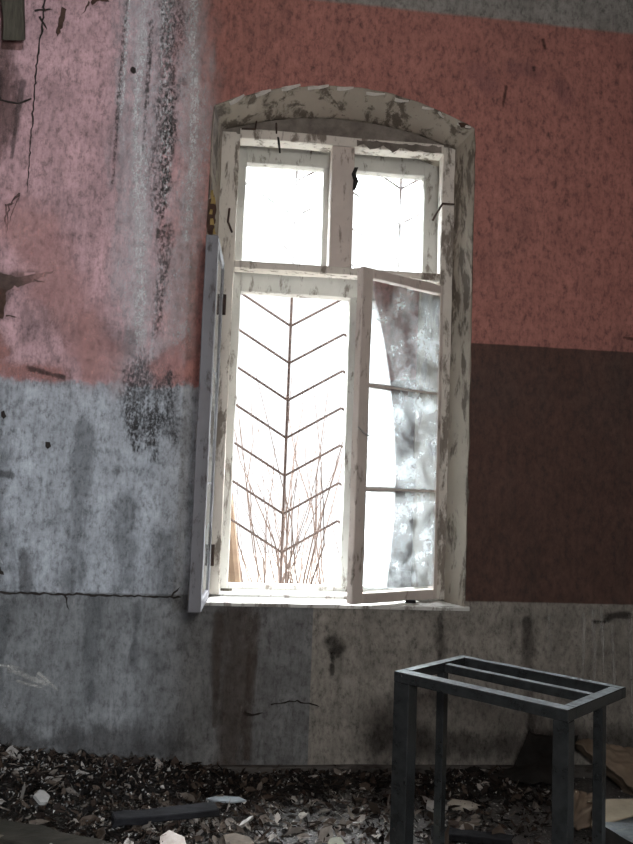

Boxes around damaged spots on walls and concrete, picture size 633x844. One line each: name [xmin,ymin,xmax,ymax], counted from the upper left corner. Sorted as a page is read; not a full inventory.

crack [0,0,51,233]
water stain [116,0,199,341]
spalling [0,270,54,319]
water stain [121,359,180,461]